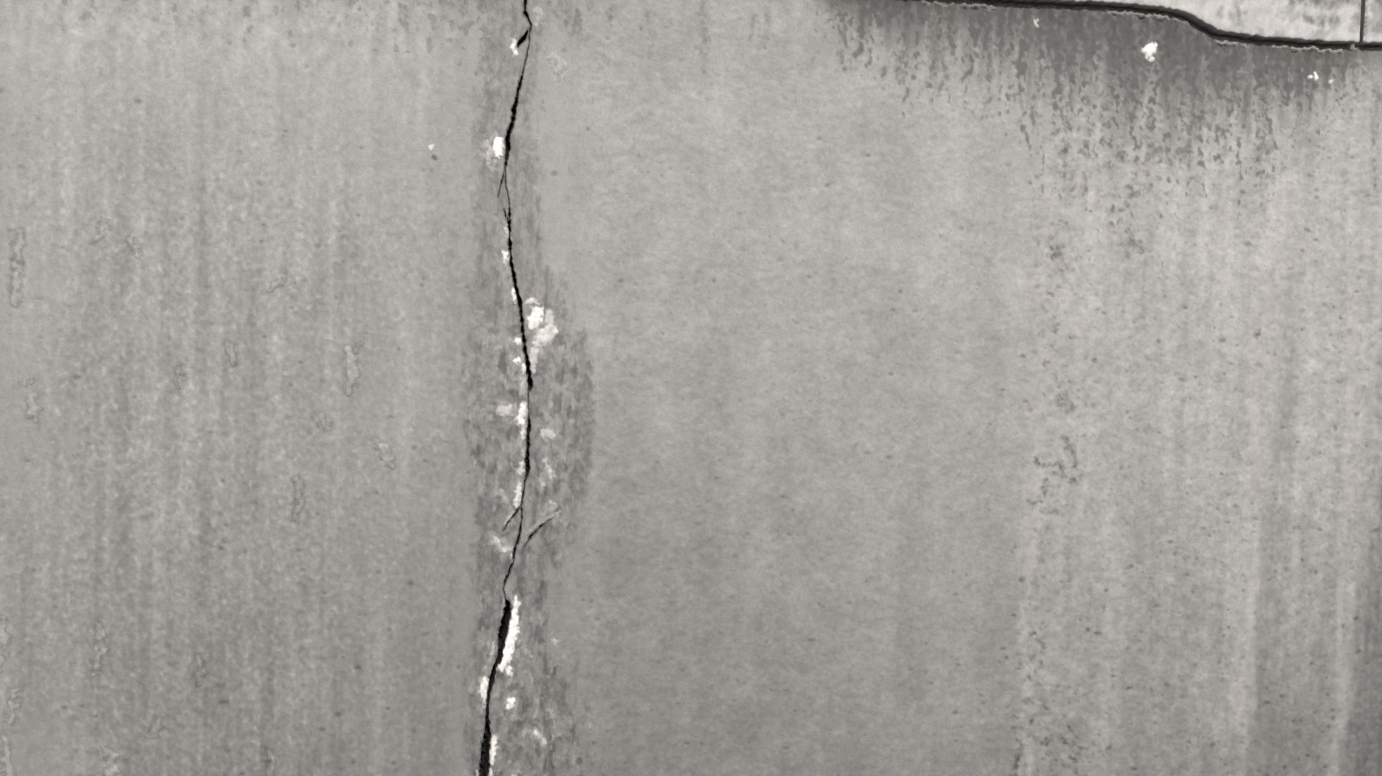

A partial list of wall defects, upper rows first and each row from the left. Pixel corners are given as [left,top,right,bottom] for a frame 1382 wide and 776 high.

crack [463,0,573,776]
damp [825,0,1375,233]